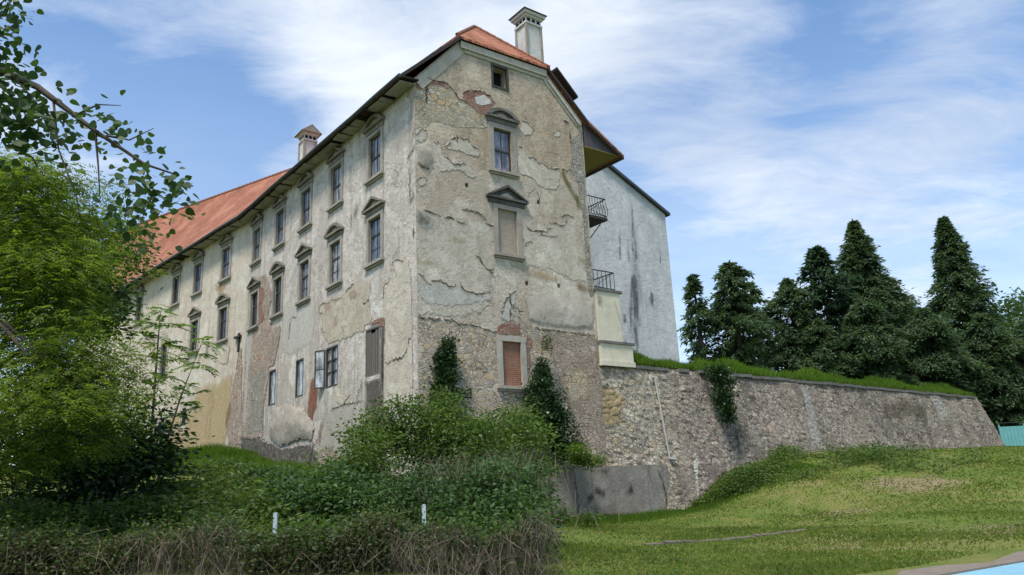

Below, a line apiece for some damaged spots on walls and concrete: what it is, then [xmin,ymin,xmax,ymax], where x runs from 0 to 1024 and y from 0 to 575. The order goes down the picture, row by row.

spalling [220,275,384,474]
spalling [414,77,496,178]
spalling [318,207,606,468]
crack [475,255,524,322]
flaking render [517,120,595,296]
leakage [624,276,638,346]